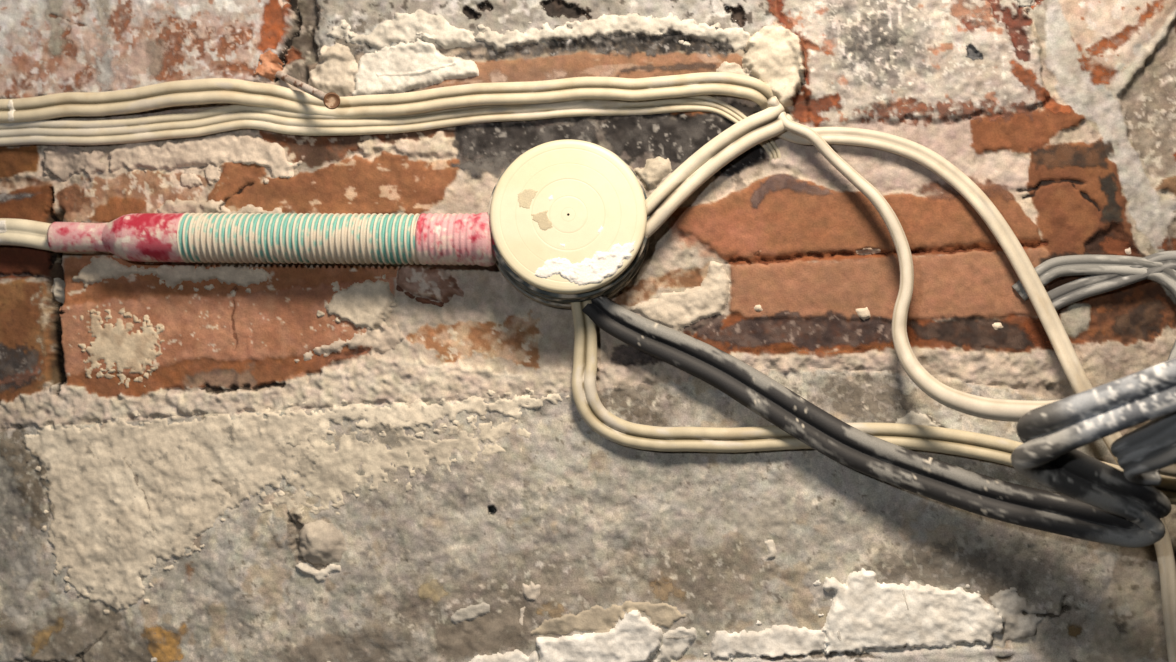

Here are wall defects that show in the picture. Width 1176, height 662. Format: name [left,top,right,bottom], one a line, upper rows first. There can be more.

flaking render [60,0,86,57]
flaking render [107,0,132,41]
spalling [150,0,302,82]
flaking render [5,72,33,99]
flaking render [59,64,102,92]
peeling [180,164,221,188]
flaking render [56,185,89,211]
spalling [382,263,464,307]
peeling [118,308,164,329]
flaking render [327,345,371,363]
leakage [435,599,534,660]
crack [16,632,106,662]